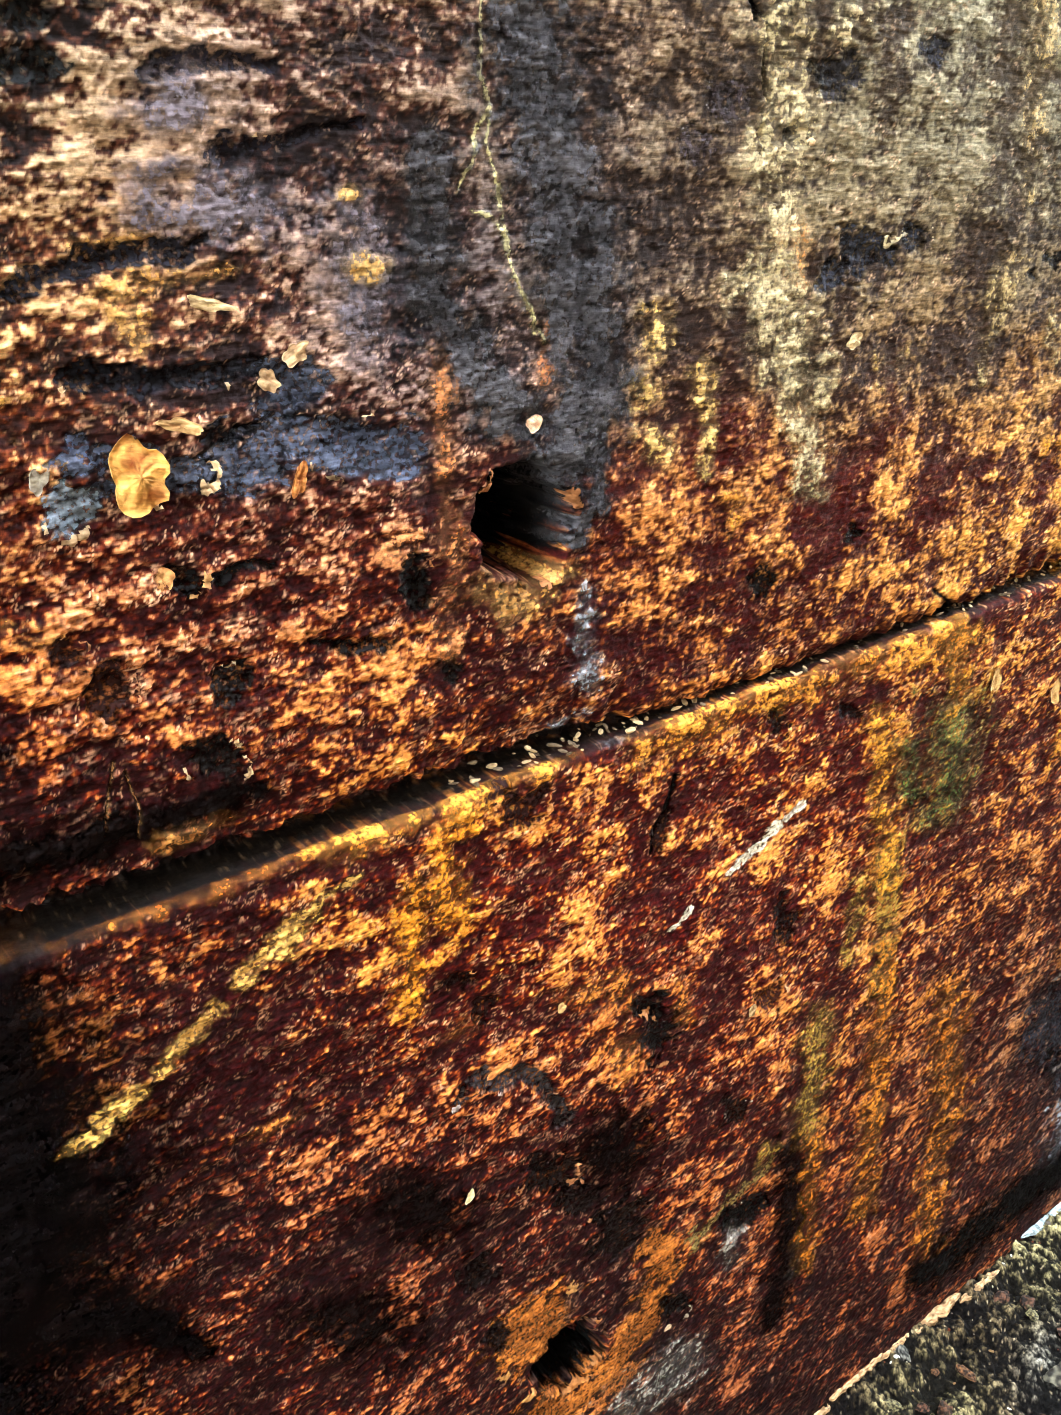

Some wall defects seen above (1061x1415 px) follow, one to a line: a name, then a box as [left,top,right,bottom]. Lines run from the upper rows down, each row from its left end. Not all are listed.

corrosion [376,526,425,566]
peeling [477,470,494,494]
peeling [553,487,584,509]
corrosion [627,614,989,784]
corrosion [860,705,905,897]
corrosion [210,760,560,1020]
spalling [450,1061,578,1129]
corrosion [844,940,903,1223]
corrosion [907,966,976,1255]
spalling [1012,947,1061,1102]
spalling [467,1146,692,1415]
spalling [715,1186,773,1239]